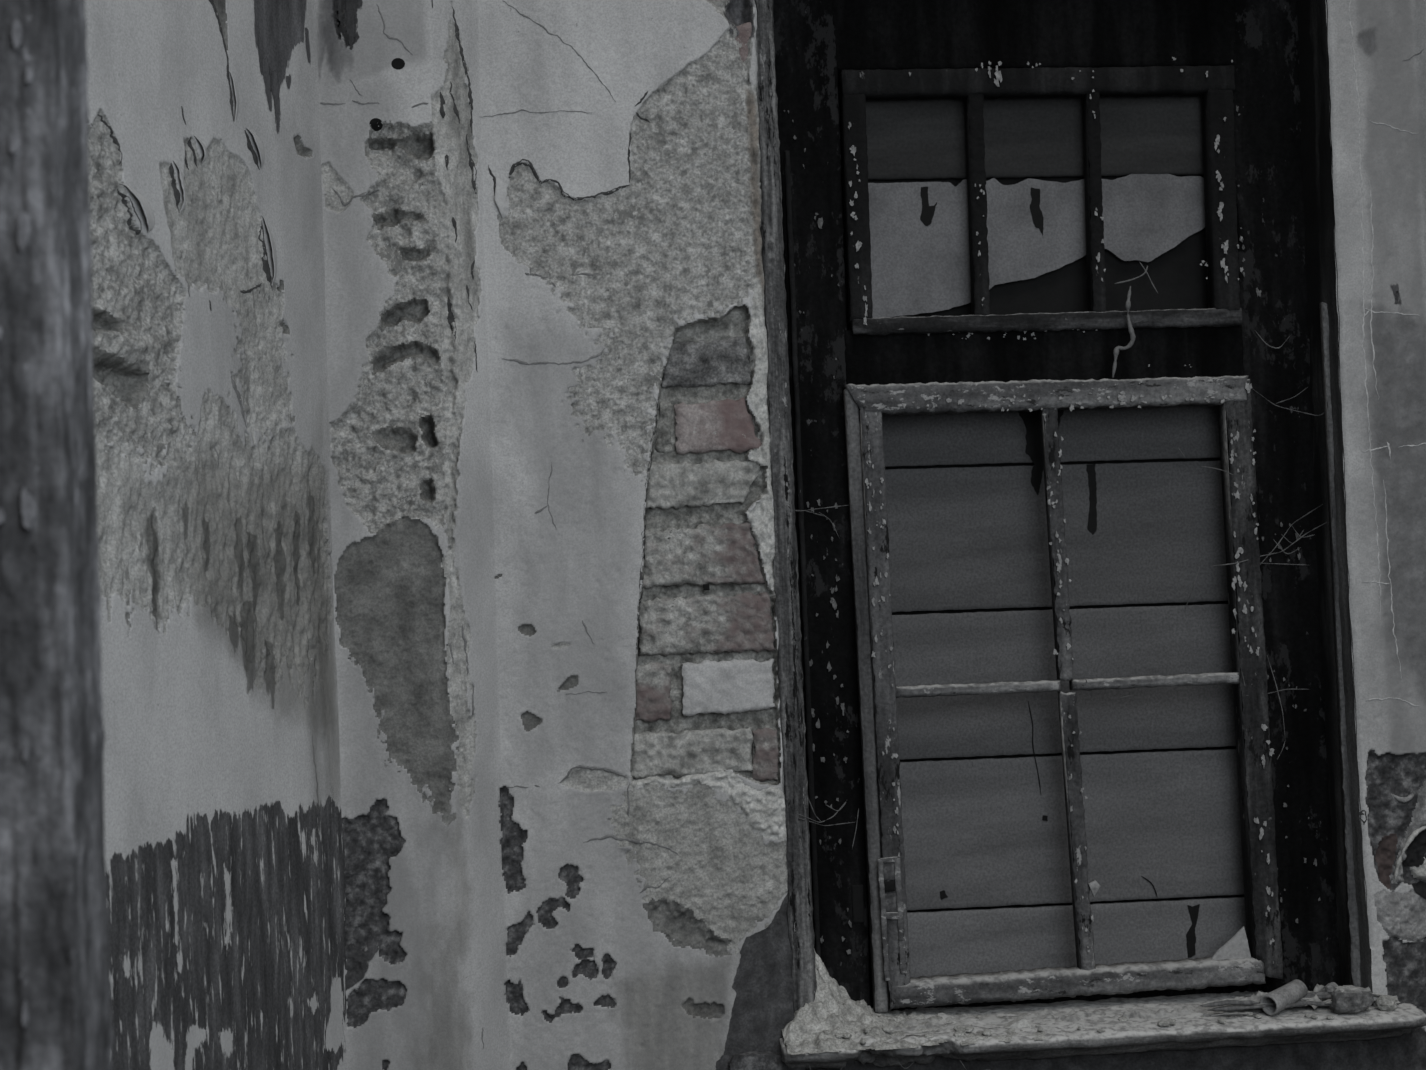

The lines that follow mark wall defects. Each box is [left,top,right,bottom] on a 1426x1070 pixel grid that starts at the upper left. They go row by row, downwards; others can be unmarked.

spalling [88,0,482,818]
flaking render [497,0,781,786]
peeling [106,796,407,1070]
peeling [498,786,528,894]
peeling [506,864,583,957]
peeling [504,944,617,1023]
spalling [1365,748,1426,899]
peeling [567,1054,611,1070]